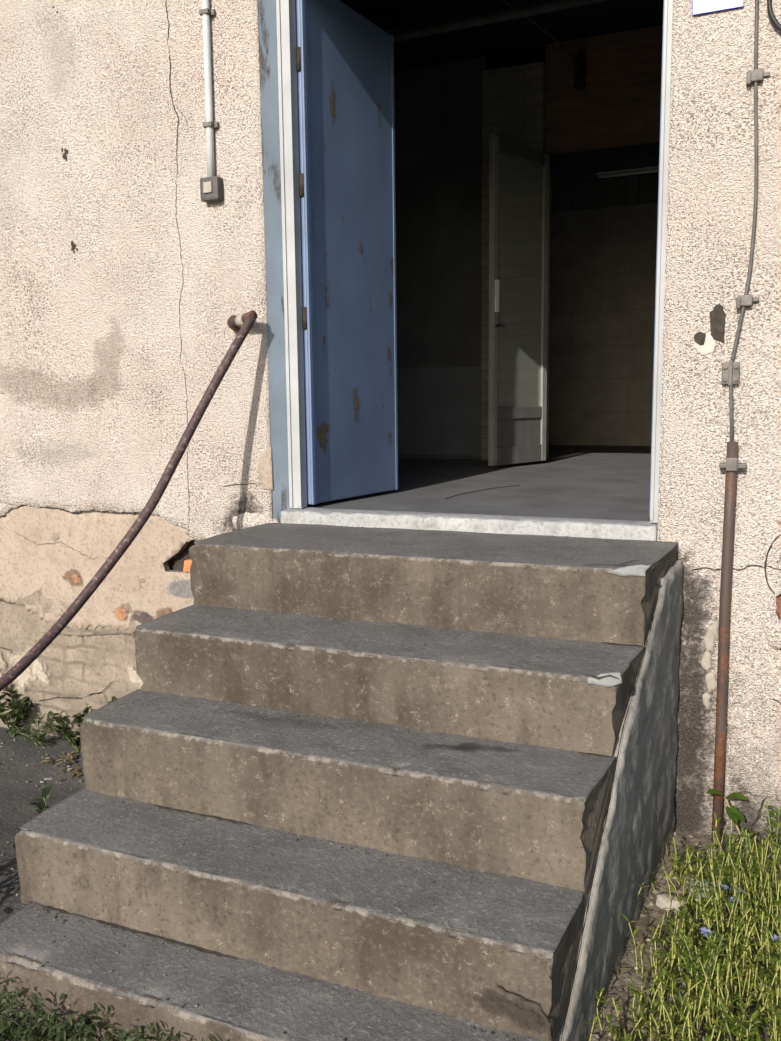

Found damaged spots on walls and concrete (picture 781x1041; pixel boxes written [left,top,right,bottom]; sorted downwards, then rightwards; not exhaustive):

crack [165,3,188,425]
flaking render [693,332,716,356]
crack [184,451,192,539]
peeling [0,505,198,631]
peeling [760,594,781,650]
water stain [674,551,712,833]
peeling [700,621,781,801]